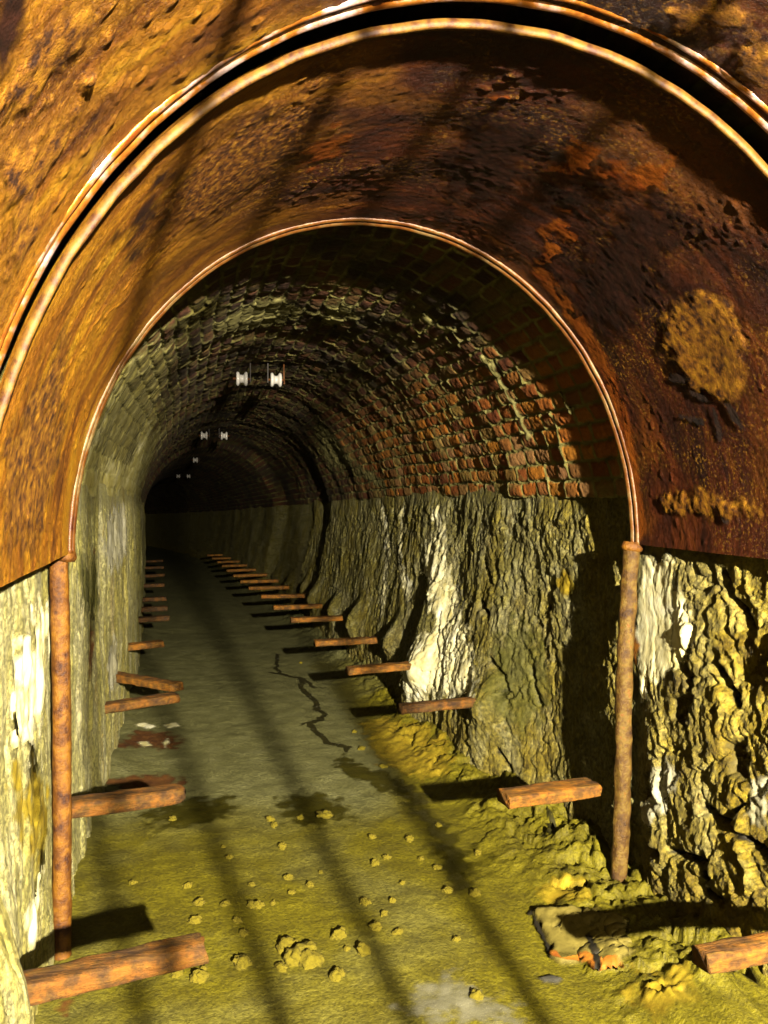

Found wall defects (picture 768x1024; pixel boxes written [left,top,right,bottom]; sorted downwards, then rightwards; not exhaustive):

rust [548,136,675,192]
rust [532,210,646,540]
crack [269,654,352,752]